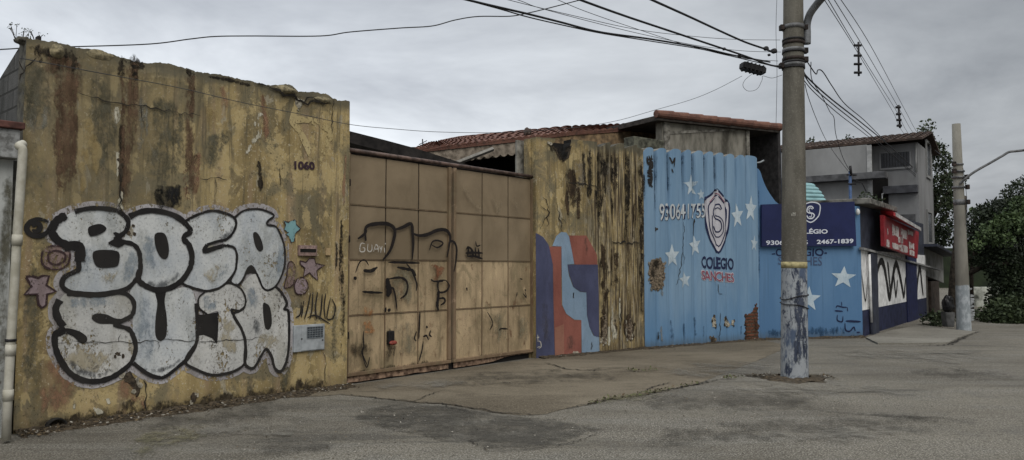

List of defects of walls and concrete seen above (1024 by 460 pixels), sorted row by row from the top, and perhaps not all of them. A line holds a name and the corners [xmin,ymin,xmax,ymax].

water stain [21,45,78,129]
water stain [118,55,145,81]
crack [80,93,200,127]
water stain [140,99,182,208]
water stain [550,145,669,311]
water stain [591,244,636,349]
spalling [648,257,666,292]
spalling [709,303,760,342]